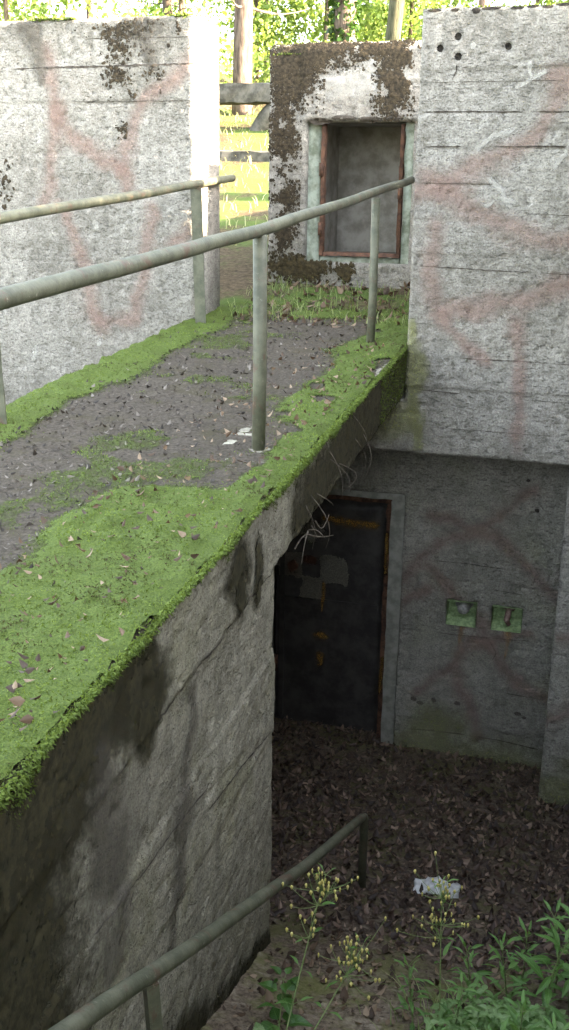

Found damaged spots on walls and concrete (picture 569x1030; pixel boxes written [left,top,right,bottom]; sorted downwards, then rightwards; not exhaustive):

damp [225,535,264,617]